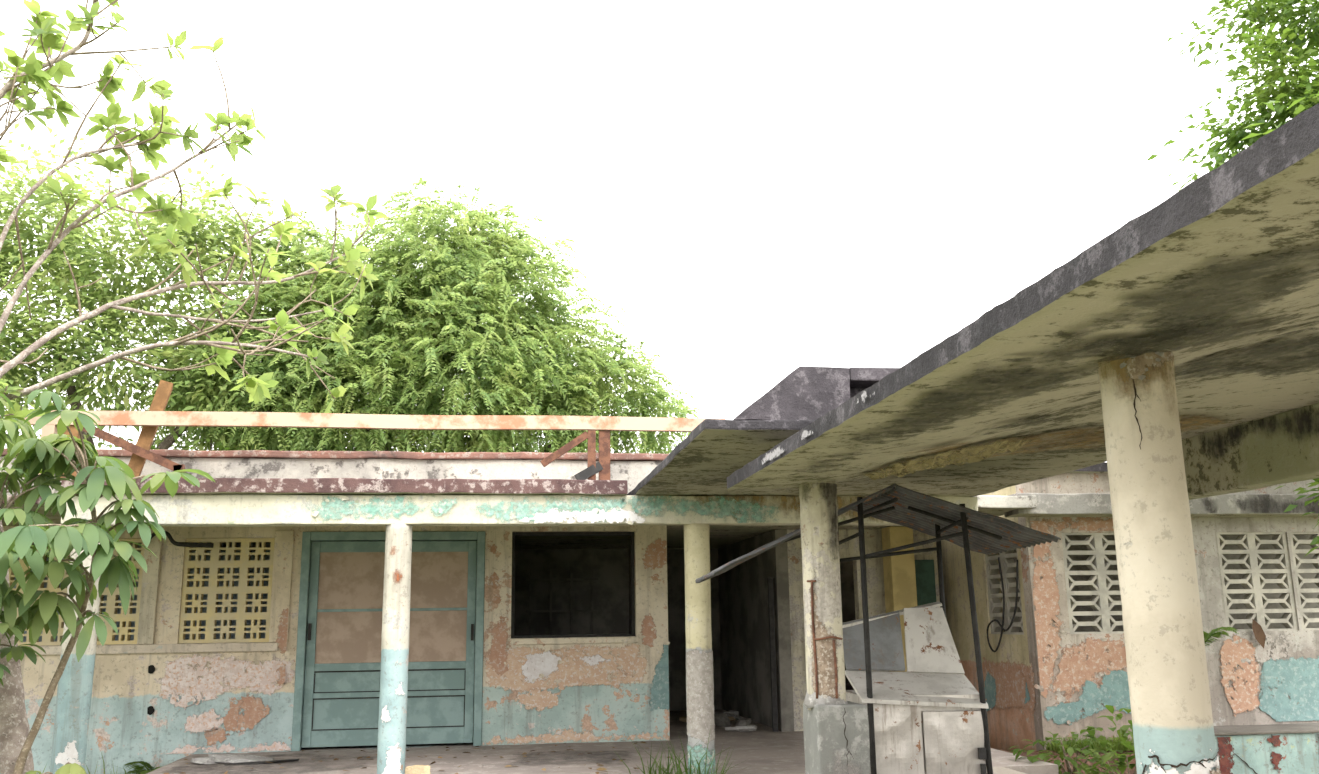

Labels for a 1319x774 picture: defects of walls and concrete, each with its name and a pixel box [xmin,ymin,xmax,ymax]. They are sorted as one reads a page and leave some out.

leakage [696,249,1319,548]
crack [1132,379,1142,449]
peeling [520,507,646,525]
peeling [146,608,295,754]
peeling [382,743,402,774]
peeling [483,728,663,745]
peeling [484,572,670,711]
peeling [686,648,715,745]
peeling [1024,518,1127,707]
peeling [1139,737,1235,774]
peeling [1219,630,1291,717]
peeling [1265,735,1283,774]